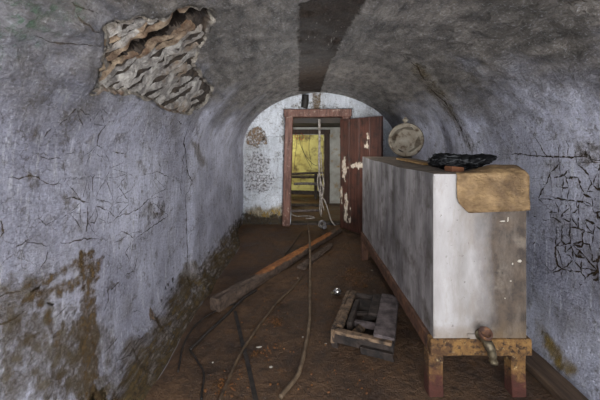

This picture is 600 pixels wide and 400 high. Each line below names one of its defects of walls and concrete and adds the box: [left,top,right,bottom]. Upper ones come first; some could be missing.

flaking render [89,5,217,115]
crack [8,109,168,309]
crack [180,123,192,286]
damp [244,126,275,195]
crack [499,135,600,286]
damp [0,249,115,400]